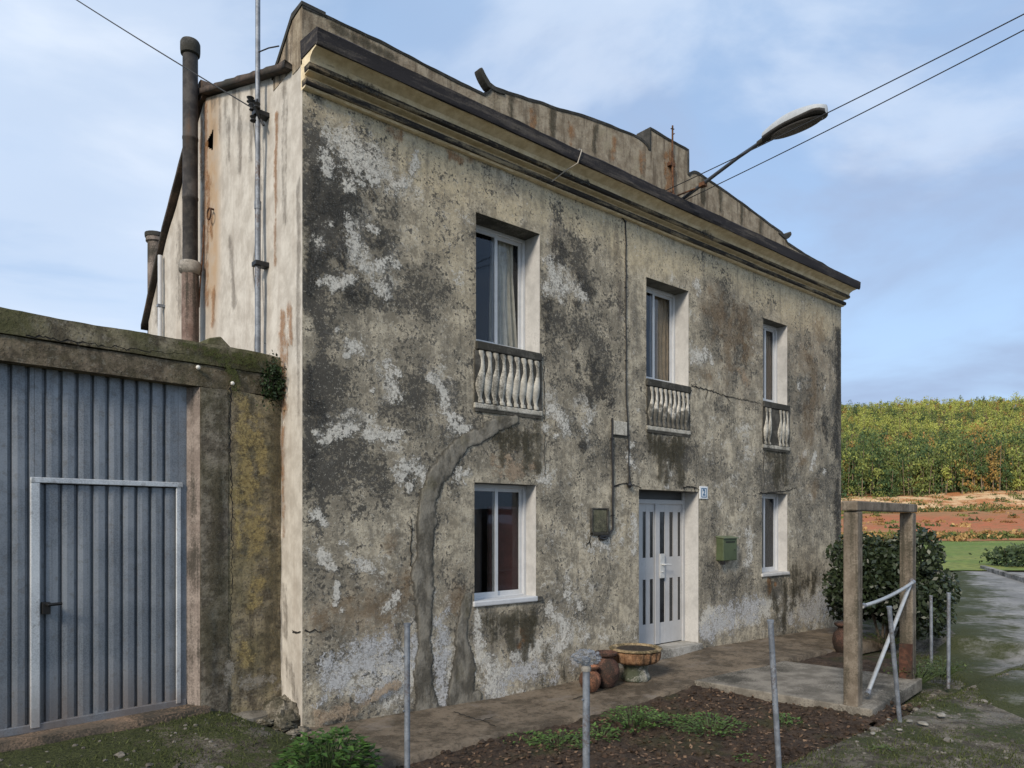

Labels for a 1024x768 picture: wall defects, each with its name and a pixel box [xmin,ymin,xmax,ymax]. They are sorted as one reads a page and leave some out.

corrosion [199,103,215,326]
water stain [303,164,380,298]
peeling [316,211,400,300]
peeling [317,128,420,198]
crack [228,387,236,657]
water stain [264,534,281,677]
water stain [270,403,280,517]
corrosion [278,307,292,513]
peeling [311,418,406,447]
peeling [382,358,403,405]
crack [407,415,519,711]
water stain [484,609,580,698]